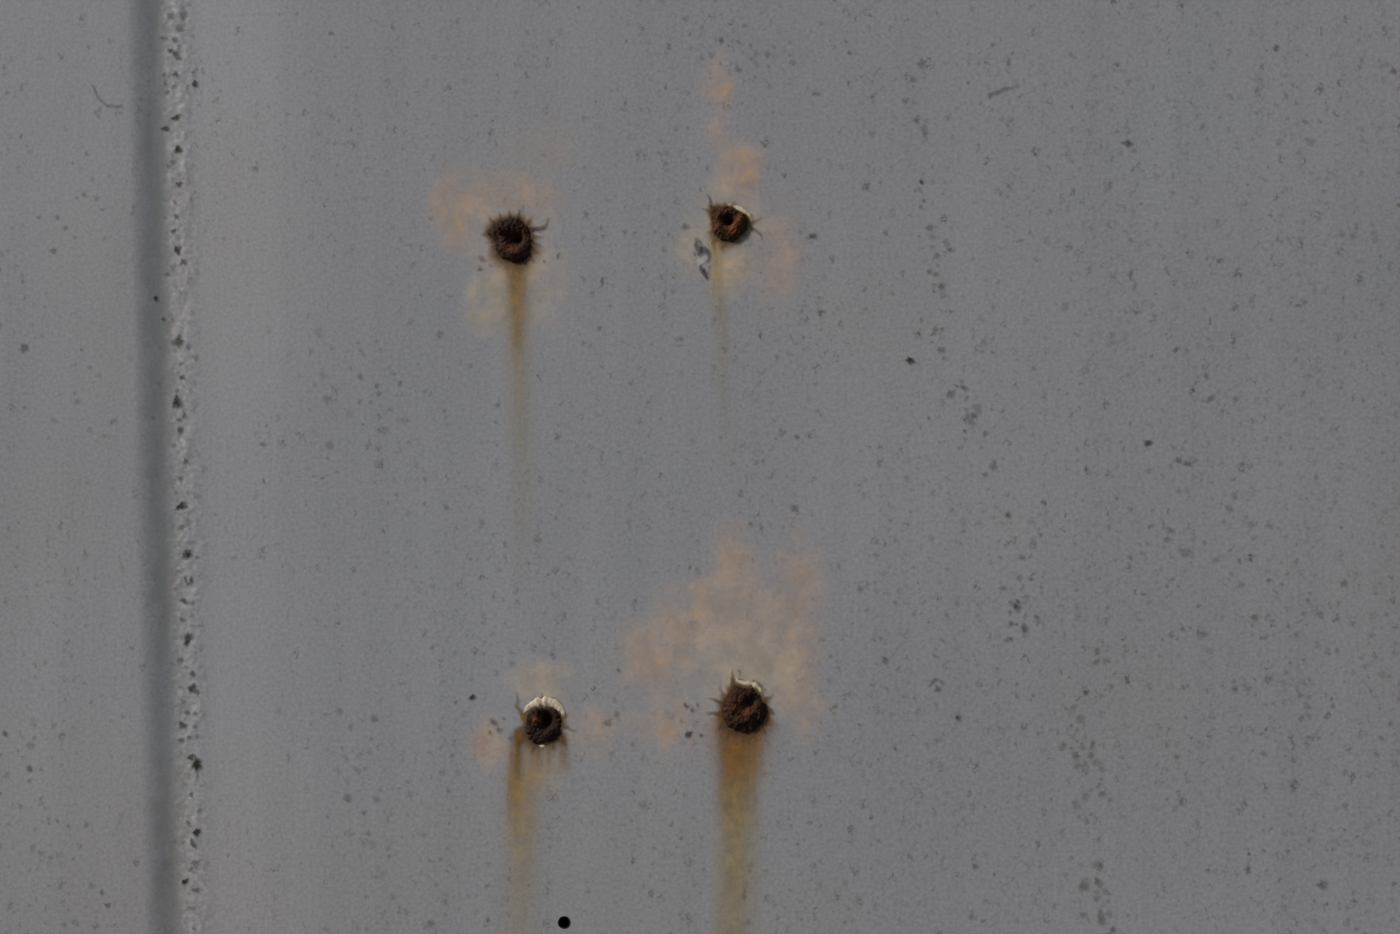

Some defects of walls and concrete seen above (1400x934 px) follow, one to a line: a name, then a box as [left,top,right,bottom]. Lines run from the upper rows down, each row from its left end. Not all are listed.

rust [486,213,547,309]
rust [709,198,759,252]
rust [511,696,566,802]
rust [714,677,772,860]